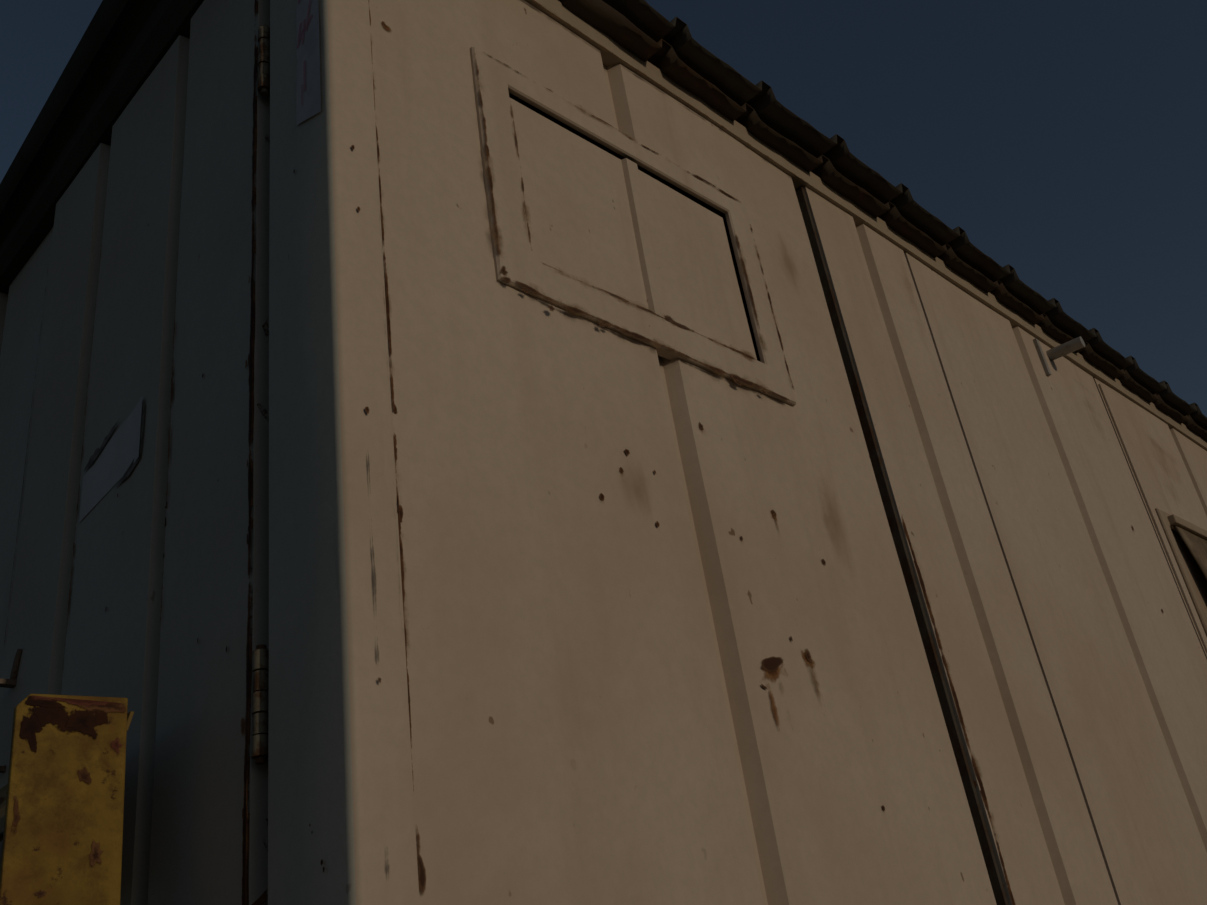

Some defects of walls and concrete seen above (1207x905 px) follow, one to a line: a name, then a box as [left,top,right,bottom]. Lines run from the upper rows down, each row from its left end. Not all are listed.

corrosion [241,32,270,905]
corrosion [761,656,783,726]
corrosion [790,636,819,694]